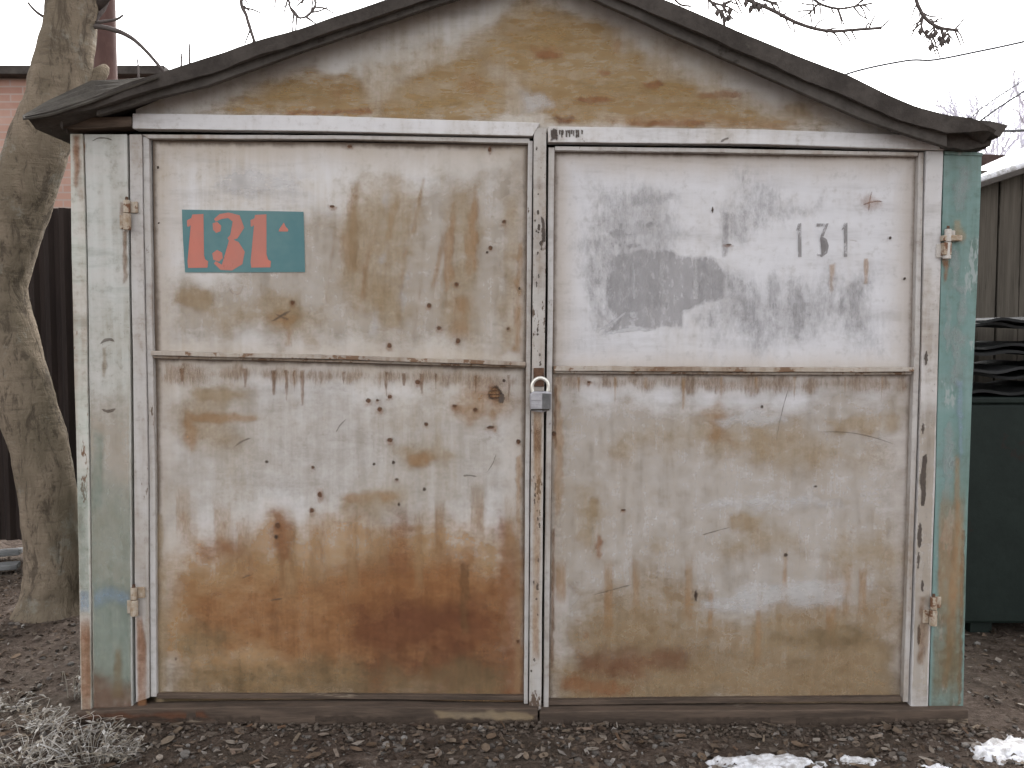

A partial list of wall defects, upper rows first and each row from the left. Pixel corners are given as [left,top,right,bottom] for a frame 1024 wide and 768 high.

corrosion [223,9,799,131]
peeling [595,241,733,334]
corrosion [265,370,330,396]
corrosion [164,510,537,701]